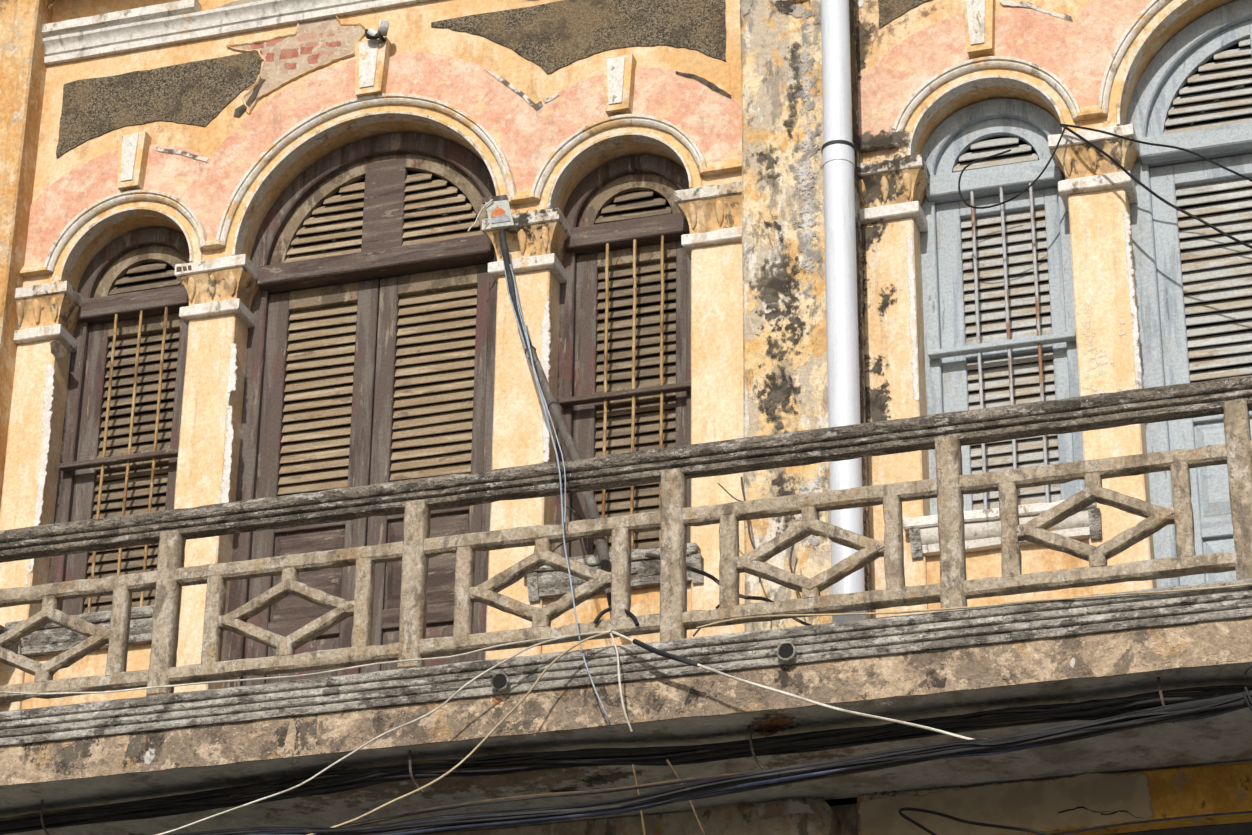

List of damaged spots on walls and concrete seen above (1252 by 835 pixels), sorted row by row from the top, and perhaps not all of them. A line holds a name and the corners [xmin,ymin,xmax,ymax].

flaking render [1000,0,1073,22]
flaking render [226,15,367,117]
flaking render [156,147,208,162]
leakage [747,0,823,434]
leakage [763,466,827,497]
leakage [765,514,802,536]
leakage [801,535,827,548]